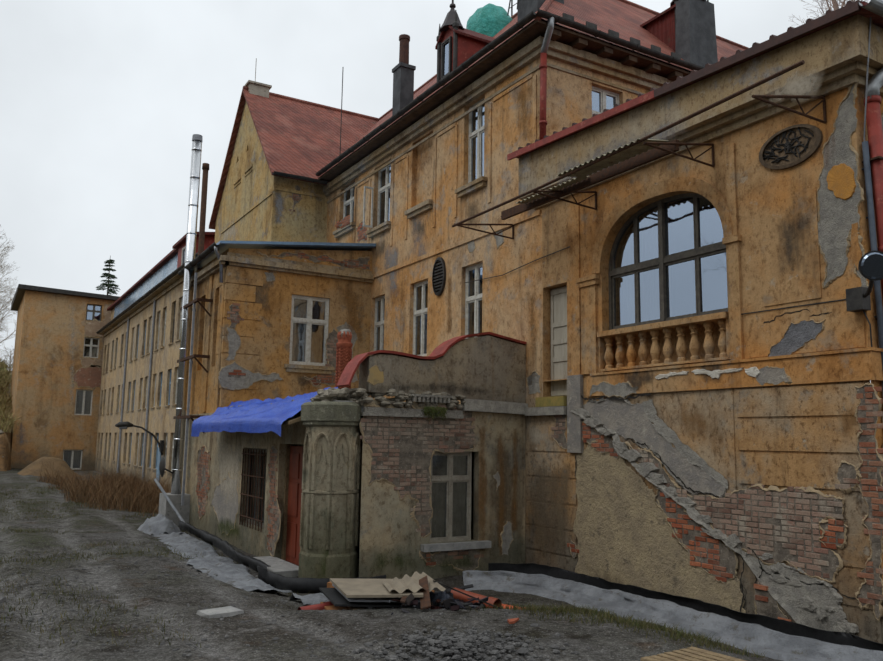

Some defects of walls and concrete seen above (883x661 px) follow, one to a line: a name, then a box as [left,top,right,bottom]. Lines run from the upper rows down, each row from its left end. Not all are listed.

flaking render [817,80,873,288]
flaking render [218,303,283,391]
flaking render [304,322,358,387]
flaking render [655,319,826,386]
flaking render [266,444,281,557]
flaking render [359,403,475,538]
flaking render [551,381,883,635]
flaking render [419,549,484,573]
crack [740,547,860,612]